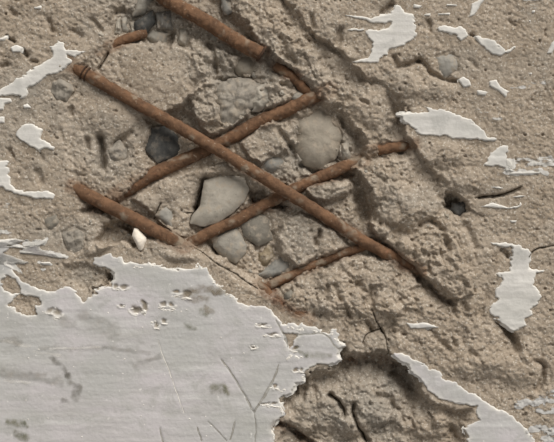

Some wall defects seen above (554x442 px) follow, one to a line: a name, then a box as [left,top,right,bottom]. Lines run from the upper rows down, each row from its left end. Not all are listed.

peeling [0,41,85,99]
peeling [477,80,509,97]
spalling [58,0,497,347]
crack [194,247,258,289]
peeling [489,242,545,333]
peeling [0,239,535,442]